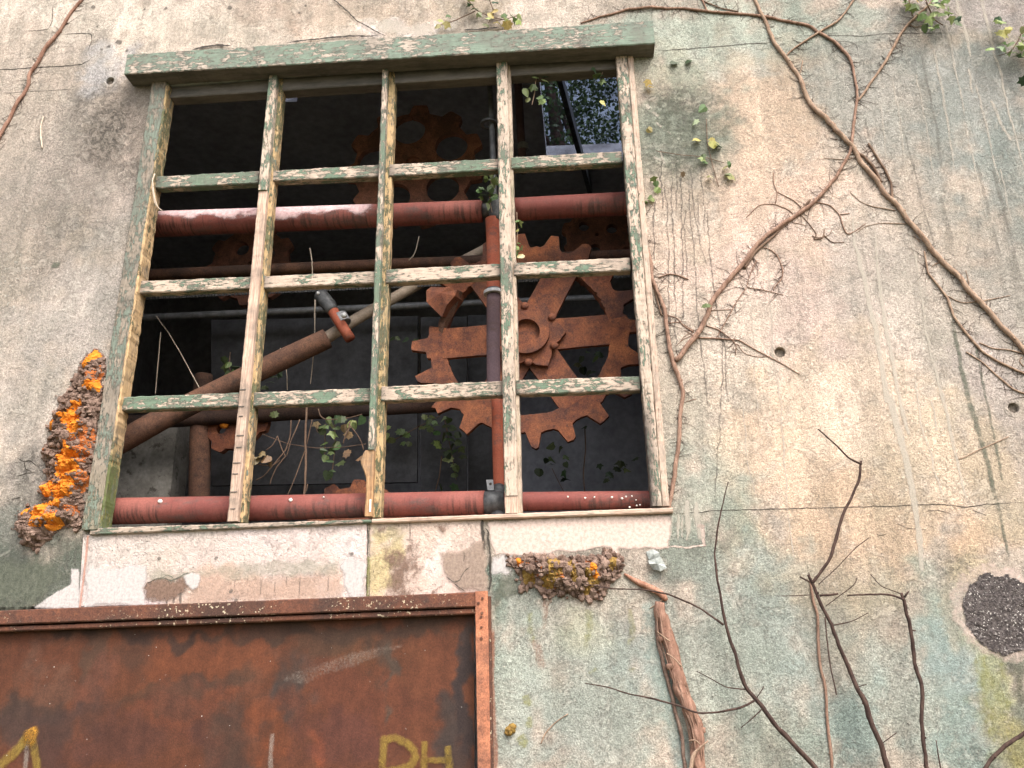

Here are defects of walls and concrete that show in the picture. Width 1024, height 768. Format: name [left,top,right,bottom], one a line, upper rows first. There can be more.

crack [673,502,1020,536]
peeling [36,566,200,608]
peeling [441,515,706,591]
spalling [982,564,1024,583]